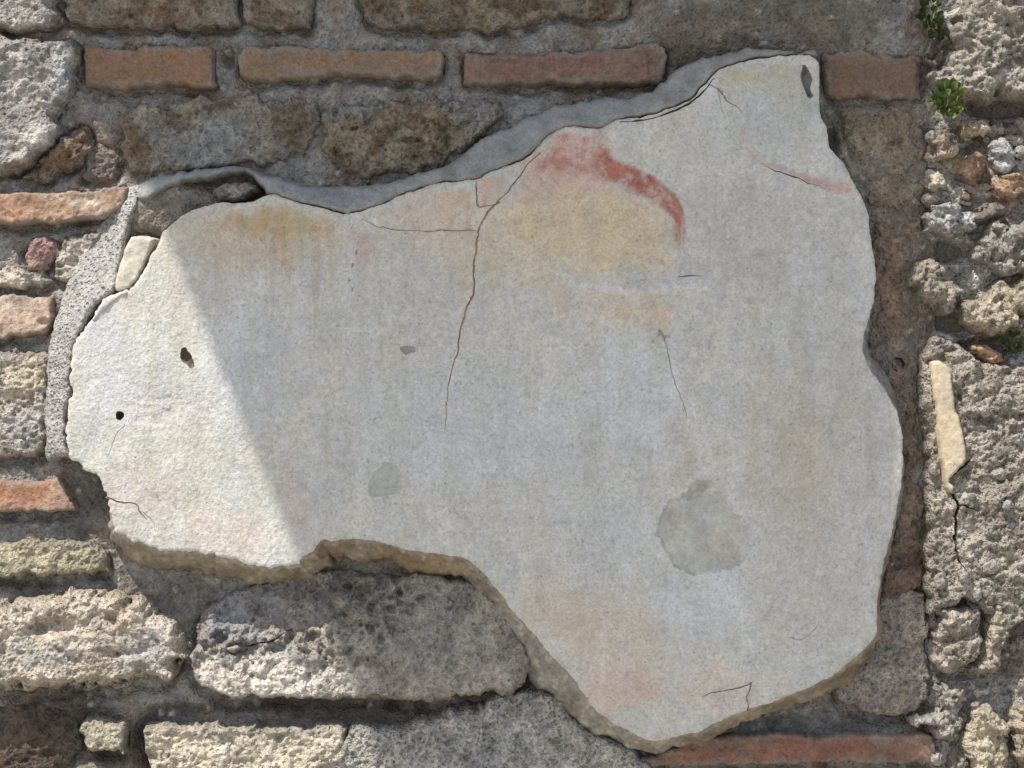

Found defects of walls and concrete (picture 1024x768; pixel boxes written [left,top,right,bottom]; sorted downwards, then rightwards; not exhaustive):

crack [765,166,825,189]
crack [362,152,541,428]
crack [660,331,687,419]
crack [106,496,156,531]
crack [951,459,980,571]
crack [703,682,752,712]